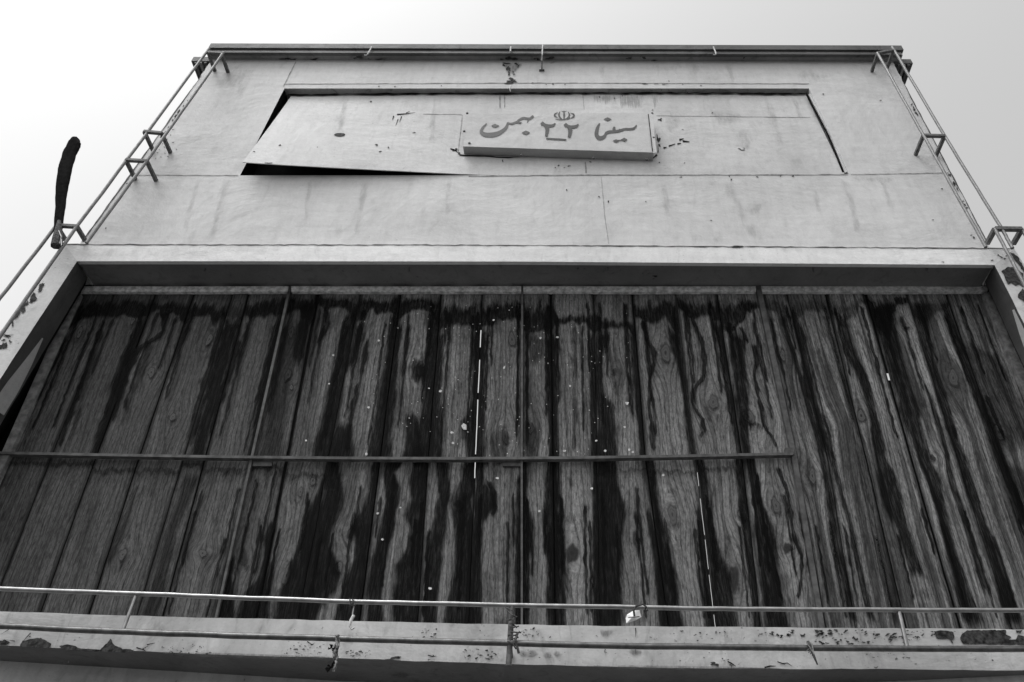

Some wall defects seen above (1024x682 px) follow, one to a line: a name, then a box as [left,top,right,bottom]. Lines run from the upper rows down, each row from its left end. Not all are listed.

peeling [991,252,1024,346]
leakage [8,296,1024,627]
peeling [758,629,1024,664]